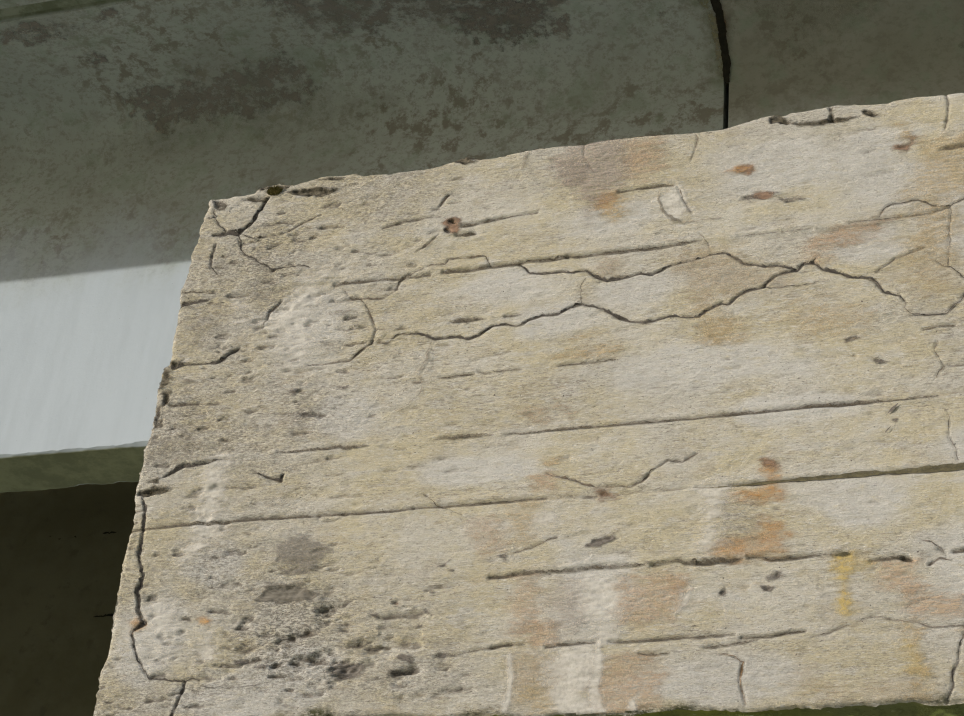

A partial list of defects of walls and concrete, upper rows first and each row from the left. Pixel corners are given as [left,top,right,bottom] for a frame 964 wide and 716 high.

crack [710,0,731,83]
corrosion [733,165,753,175]
crack [182,201,322,307]
corrosion [442,217,460,233]
crack [335,184,964,488]
crack [166,459,223,477]
crack [257,445,365,481]
crack [492,552,850,578]
crack [882,540,964,563]
crack [94,494,546,716]
leakage [544,569,624,715]
crack [547,618,864,686]